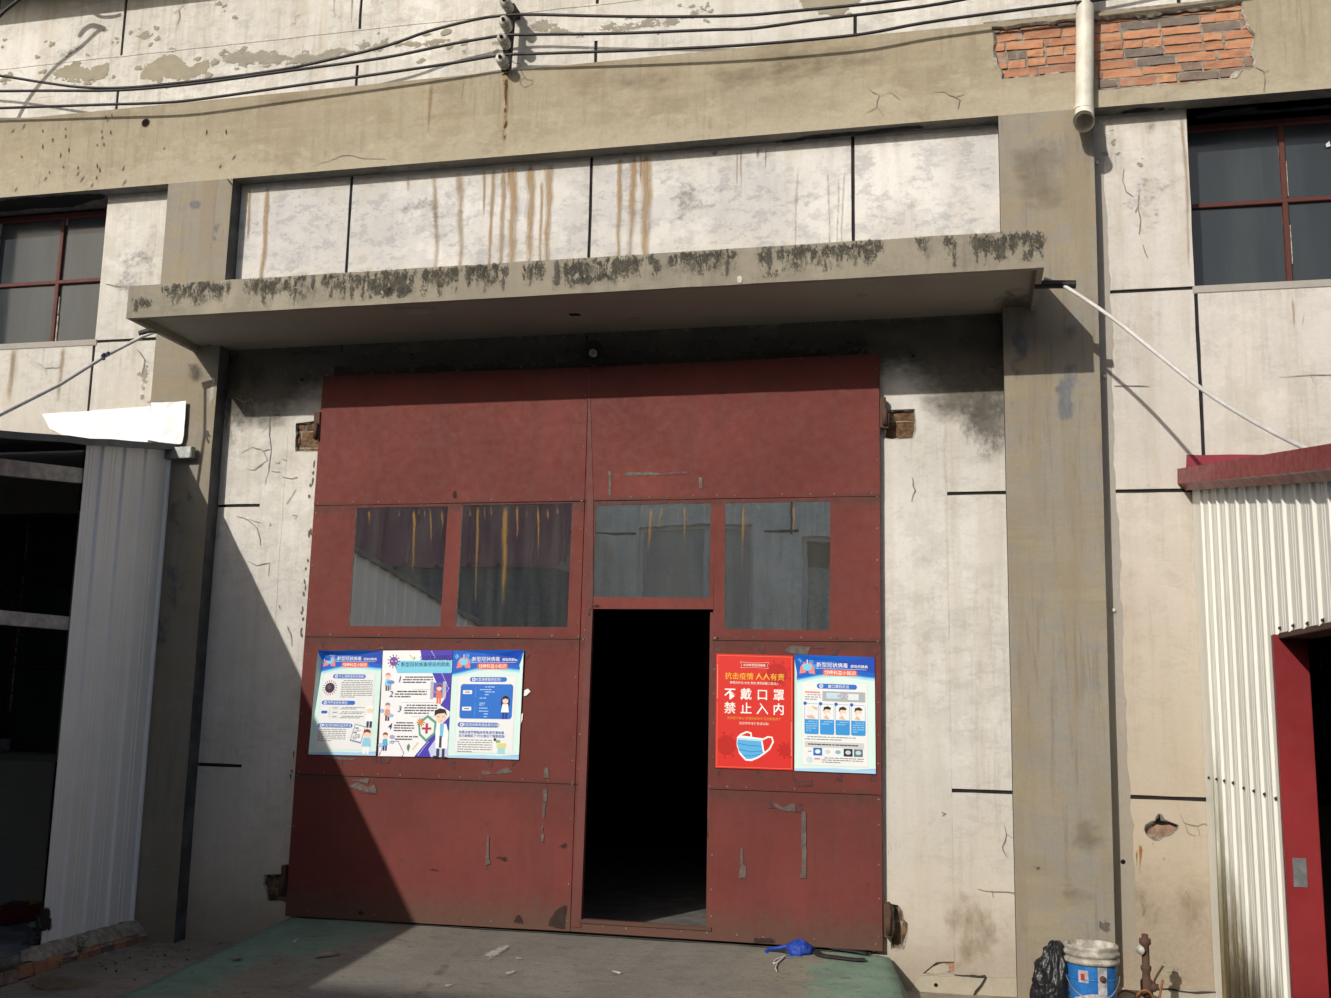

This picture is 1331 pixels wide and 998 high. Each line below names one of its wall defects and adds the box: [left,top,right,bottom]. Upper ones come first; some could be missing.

peeling [799,0,860,16]
peeling [35,40,115,85]
peeling [102,26,467,89]
flaking render [983,13,1076,79]
flaking render [1094,0,1256,90]
corrosion [483,168,552,263]
corrosion [617,158,650,256]
damp [132,249,736,316]
spalling [1144,814,1179,841]
spalling [263,874,286,903]
damp [1219,912,1267,998]